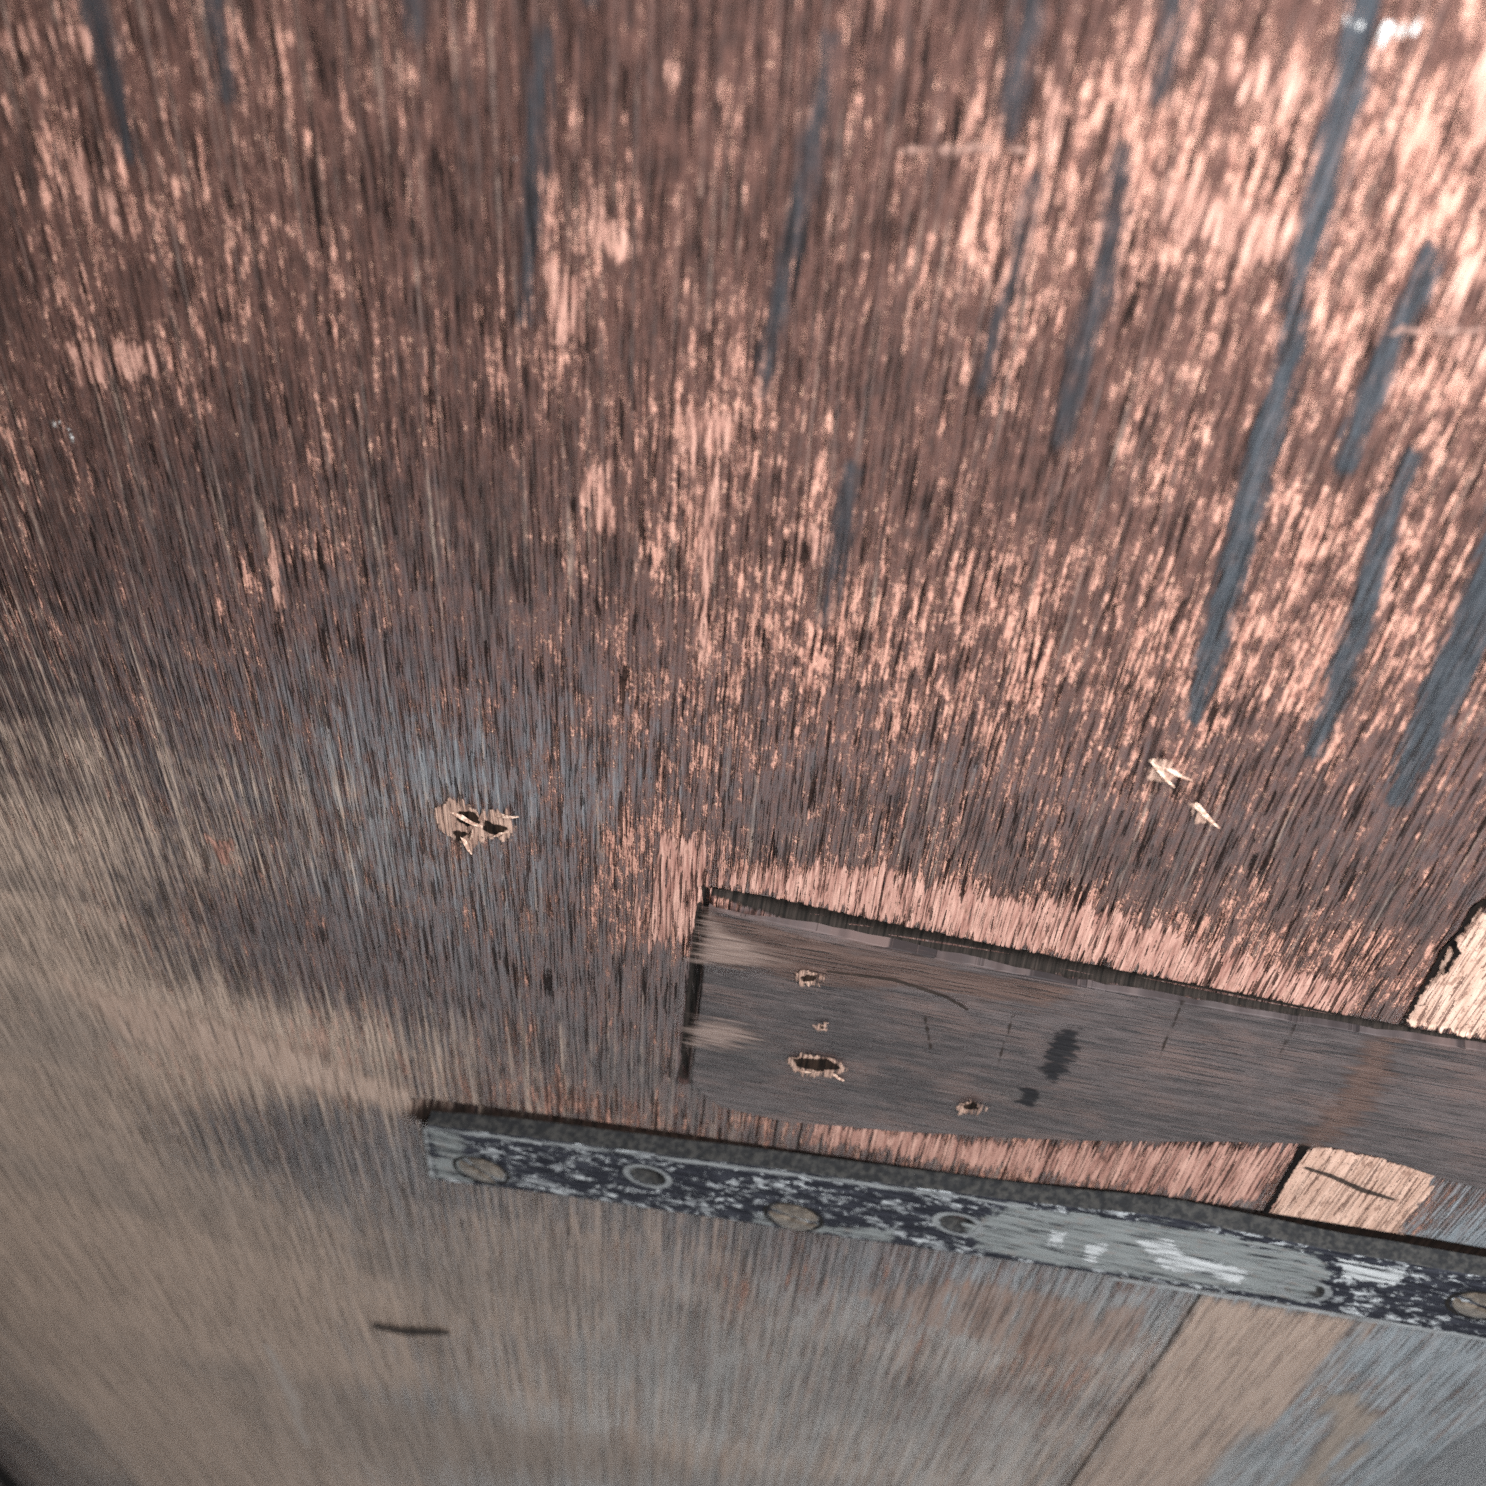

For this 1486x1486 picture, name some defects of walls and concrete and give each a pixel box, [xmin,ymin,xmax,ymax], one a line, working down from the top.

crack [1401,899,1486,1026]